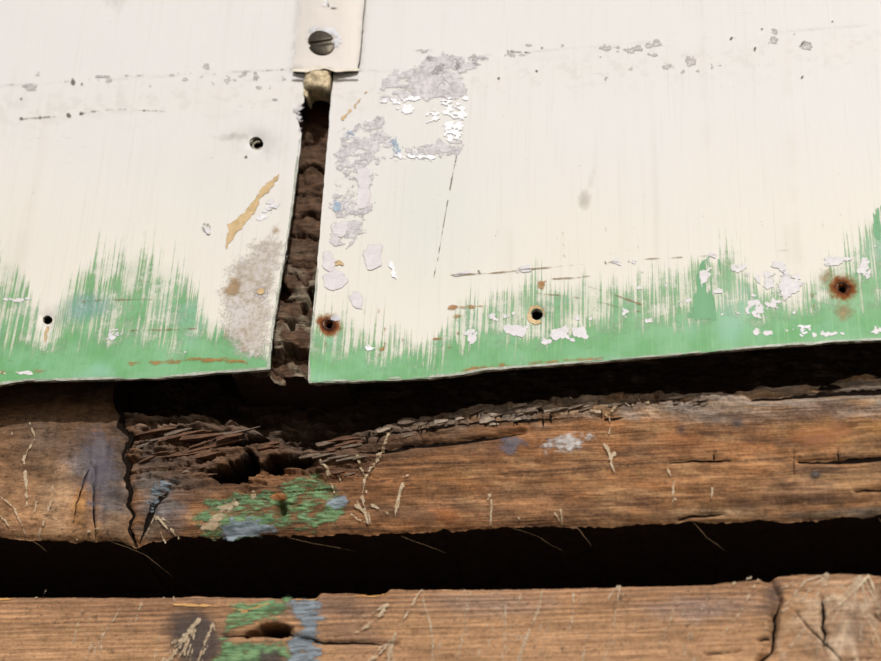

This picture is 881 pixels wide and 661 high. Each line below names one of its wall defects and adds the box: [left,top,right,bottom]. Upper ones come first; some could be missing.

peeling [599,39,661,57]
peeling [308,50,881,382]
peeling [0,139,300,385]
damp [227,279,238,294]
rust [824,274,856,317]
rust [316,315,341,344]
crack [673,453,734,463]
crack [793,452,881,466]
crack [73,470,96,538]
crack [140,491,170,543]
crack [678,513,723,521]
crack [760,600,870,661]